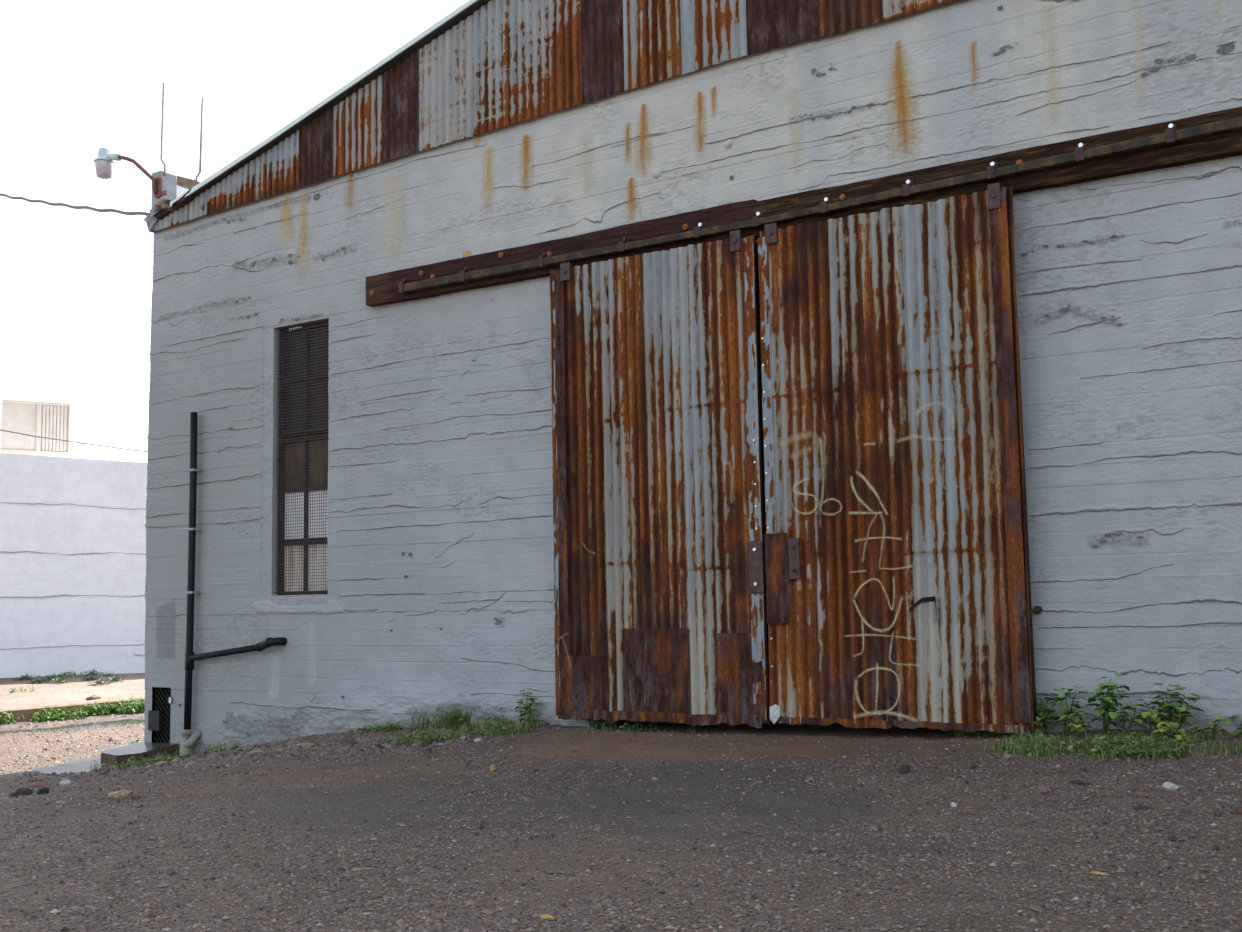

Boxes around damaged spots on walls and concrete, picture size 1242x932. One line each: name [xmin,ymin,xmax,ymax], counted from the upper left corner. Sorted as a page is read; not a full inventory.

rust [893,42,911,139]
rust [626,105,648,158]
rust [697,91,715,145]
crack [489,24,1242,235]
crack [1028,441,1242,469]
crack [1030,500,1242,628]
crack [1035,663,1242,698]